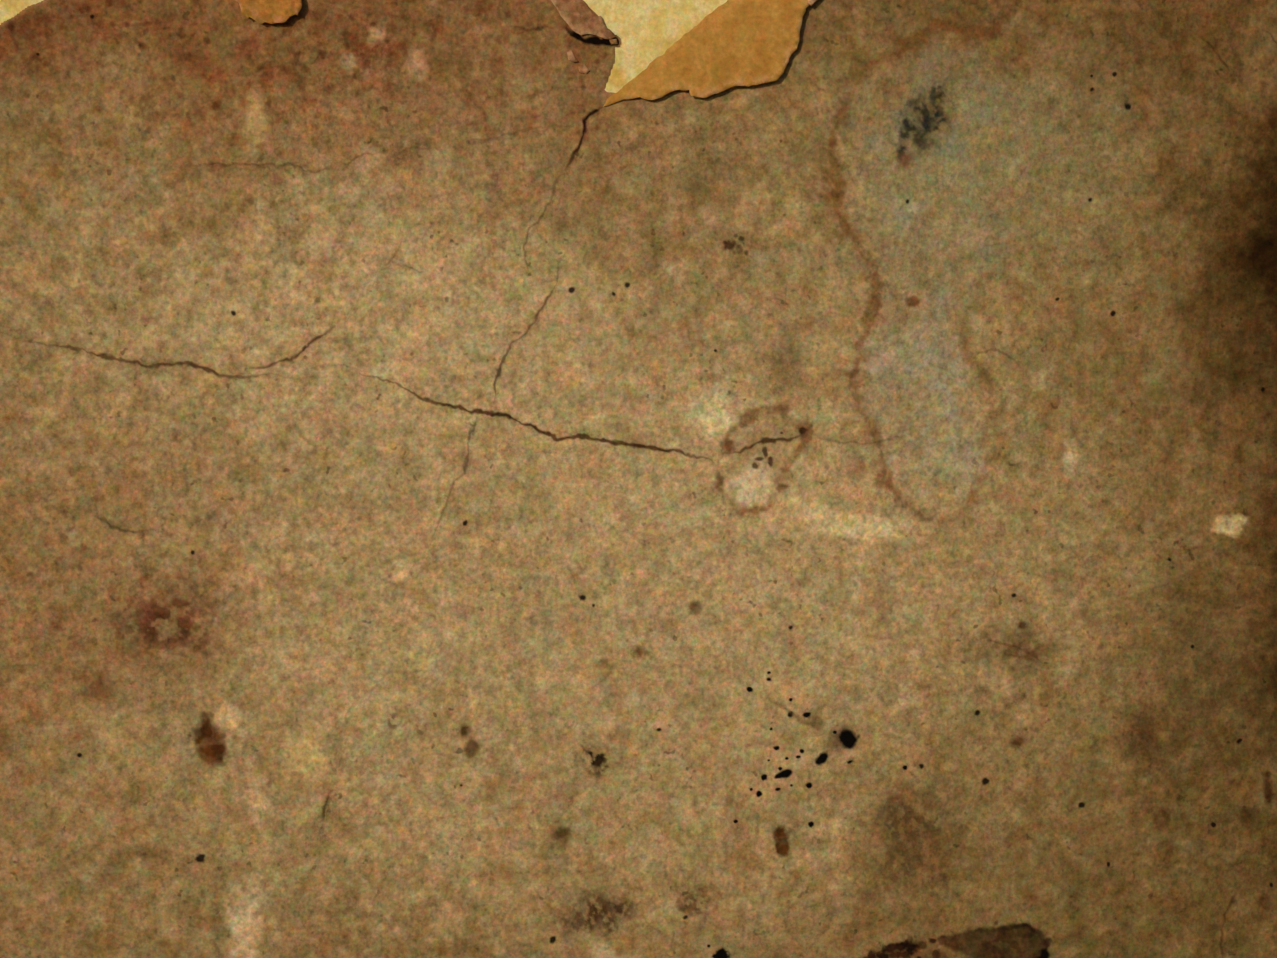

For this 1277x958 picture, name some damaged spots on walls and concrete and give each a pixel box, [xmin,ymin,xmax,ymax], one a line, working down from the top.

peeling [0,0,43,25]
peeling [235,0,302,24]
peeling [508,0,817,107]
crack [22,105,908,538]
leakage [709,0,1159,537]
crack [388,575,418,607]